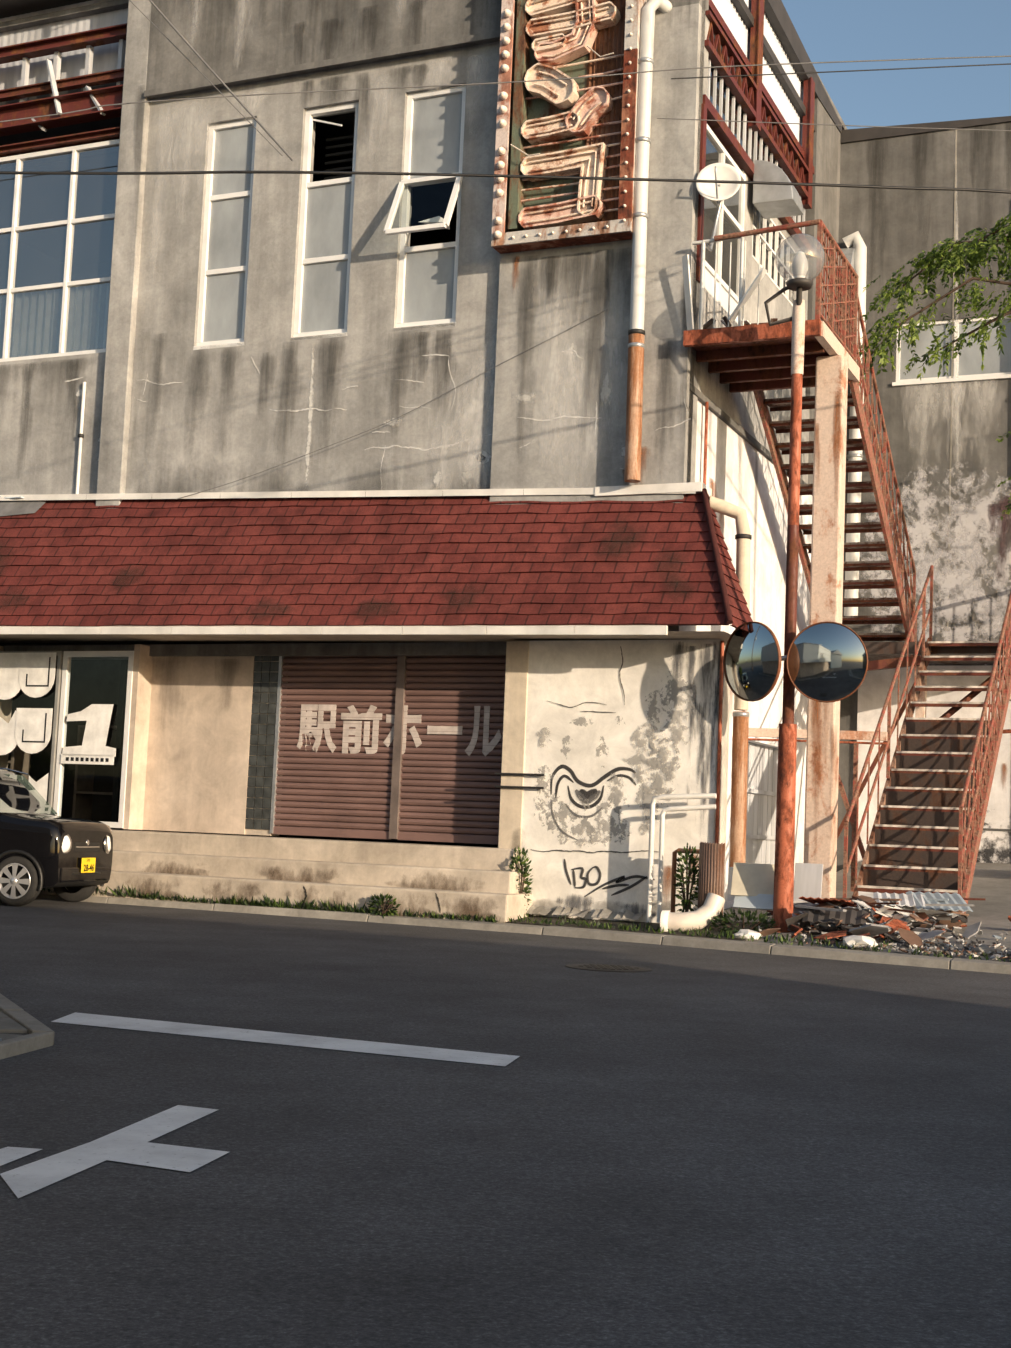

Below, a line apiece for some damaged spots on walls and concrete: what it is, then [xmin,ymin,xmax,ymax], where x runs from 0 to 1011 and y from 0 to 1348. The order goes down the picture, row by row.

water stain [305,345,336,481]
water stain [466,377,483,447]
flaking render [860,465,1011,641]
peeling [534,658,695,846]
rust [813,701,836,764]